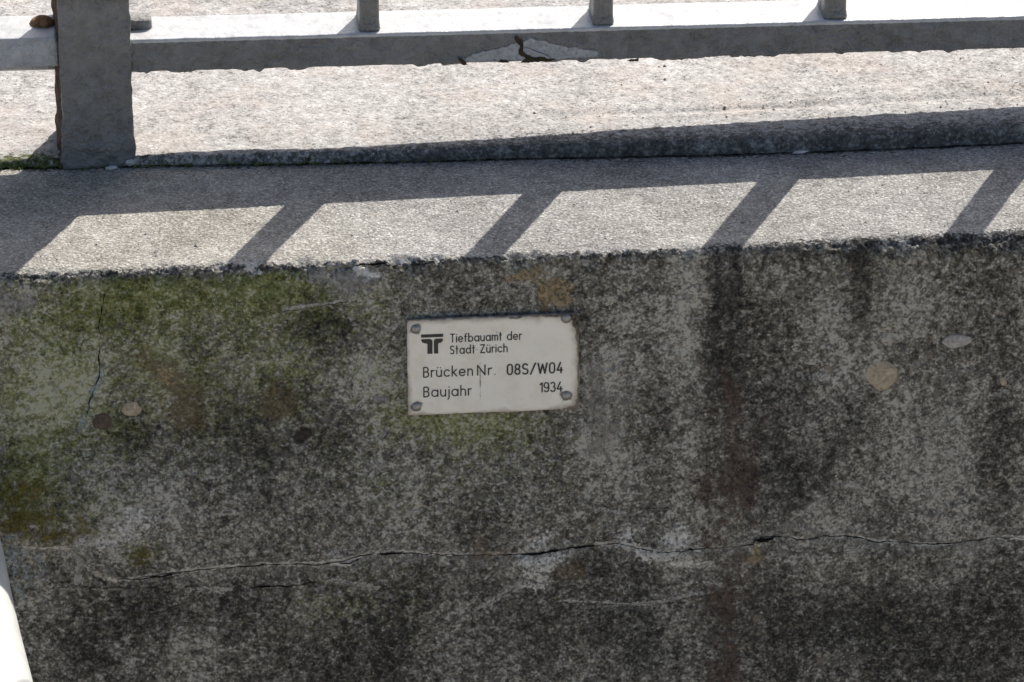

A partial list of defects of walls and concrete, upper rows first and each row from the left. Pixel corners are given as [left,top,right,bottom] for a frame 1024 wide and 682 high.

peeling [458,38,599,65]
crack [76,294,106,434]
crack [22,533,1024,612]